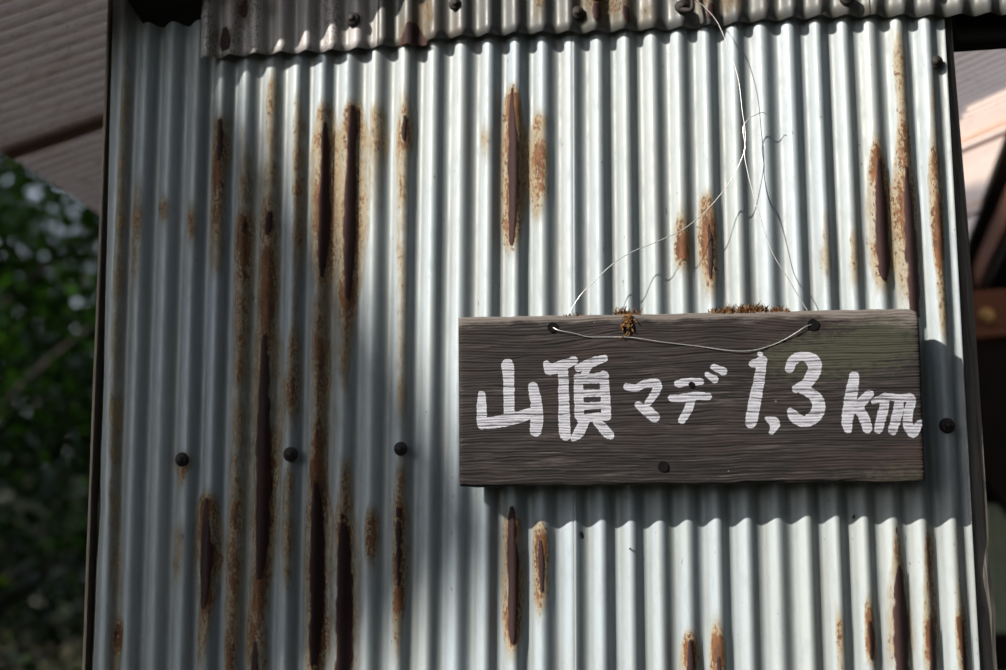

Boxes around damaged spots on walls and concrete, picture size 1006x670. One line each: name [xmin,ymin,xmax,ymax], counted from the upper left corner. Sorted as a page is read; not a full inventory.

rust [481,84,549,251]
rust [674,191,719,292]
rust [850,34,921,317]
rust [928,124,949,335]
rust [191,70,415,670]
rust [499,506,549,656]
rust [681,621,727,670]
rust [865,527,911,670]
rust [923,524,939,670]